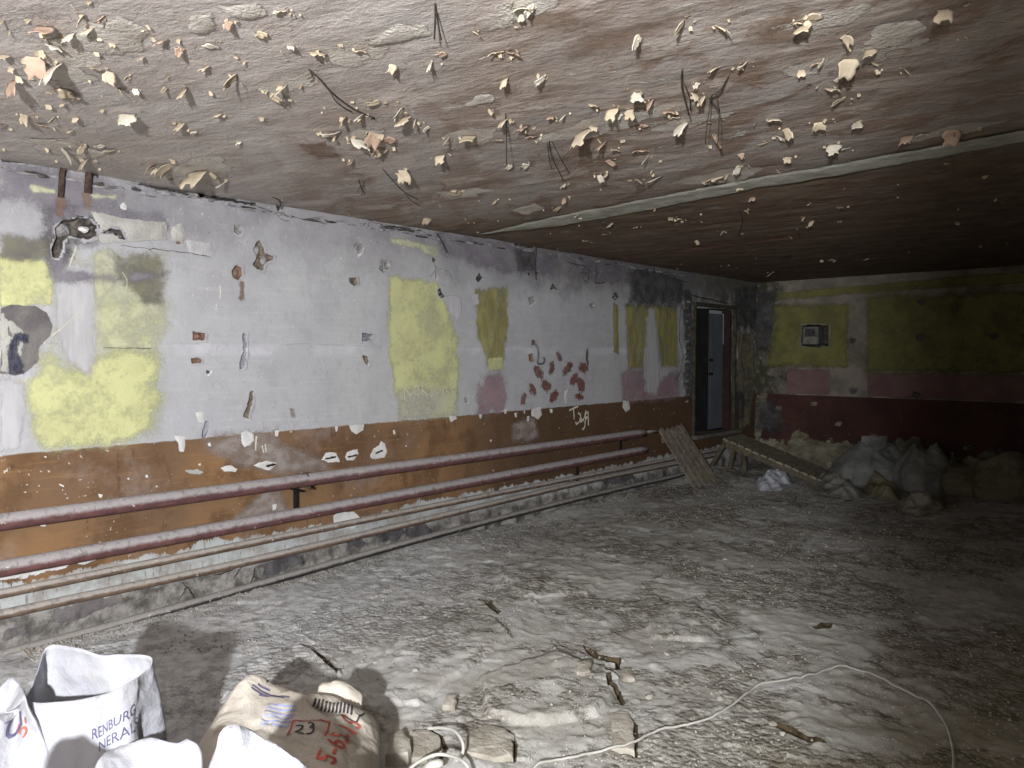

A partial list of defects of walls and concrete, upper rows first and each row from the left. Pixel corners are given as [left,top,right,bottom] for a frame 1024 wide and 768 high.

peeling [933,3,971,24]
peeling [771,3,930,133]
peeling [0,0,685,283]
peeling [316,62,763,214]
peeling [753,118,794,146]
peeling [823,141,855,162]
corrosion [56,168,66,215]
corrosion [83,172,93,208]
water stain [627,269,686,307]
flaking render [0,313,23,373]
peeling [322,430,395,463]
peeling [0,560,95,580]